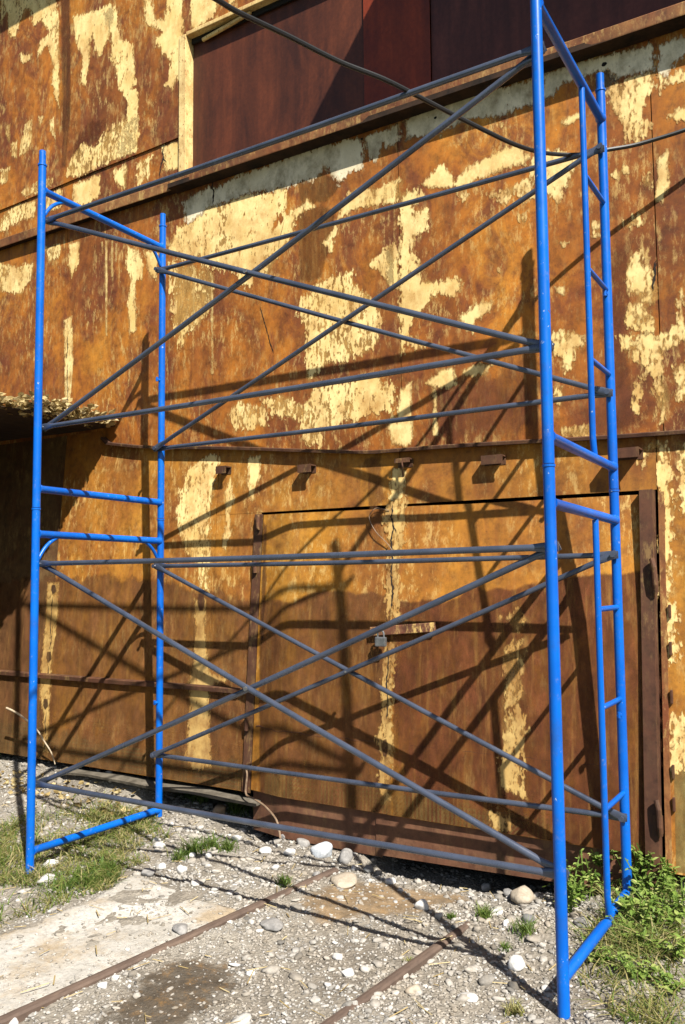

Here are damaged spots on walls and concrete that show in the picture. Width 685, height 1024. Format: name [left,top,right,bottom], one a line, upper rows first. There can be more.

corrosion [62,0,95,166]
peeling [0,0,179,231]
peeling [143,0,217,91]
corrosion [298,176,333,281]
peeling [101,35,685,374]
peeling [227,269,413,449]
peeling [425,362,493,436]
peeling [615,247,685,425]
peeling [175,453,235,772]
crack [389,504,397,608]
peeling [636,439,685,667]
peeling [496,607,531,800]